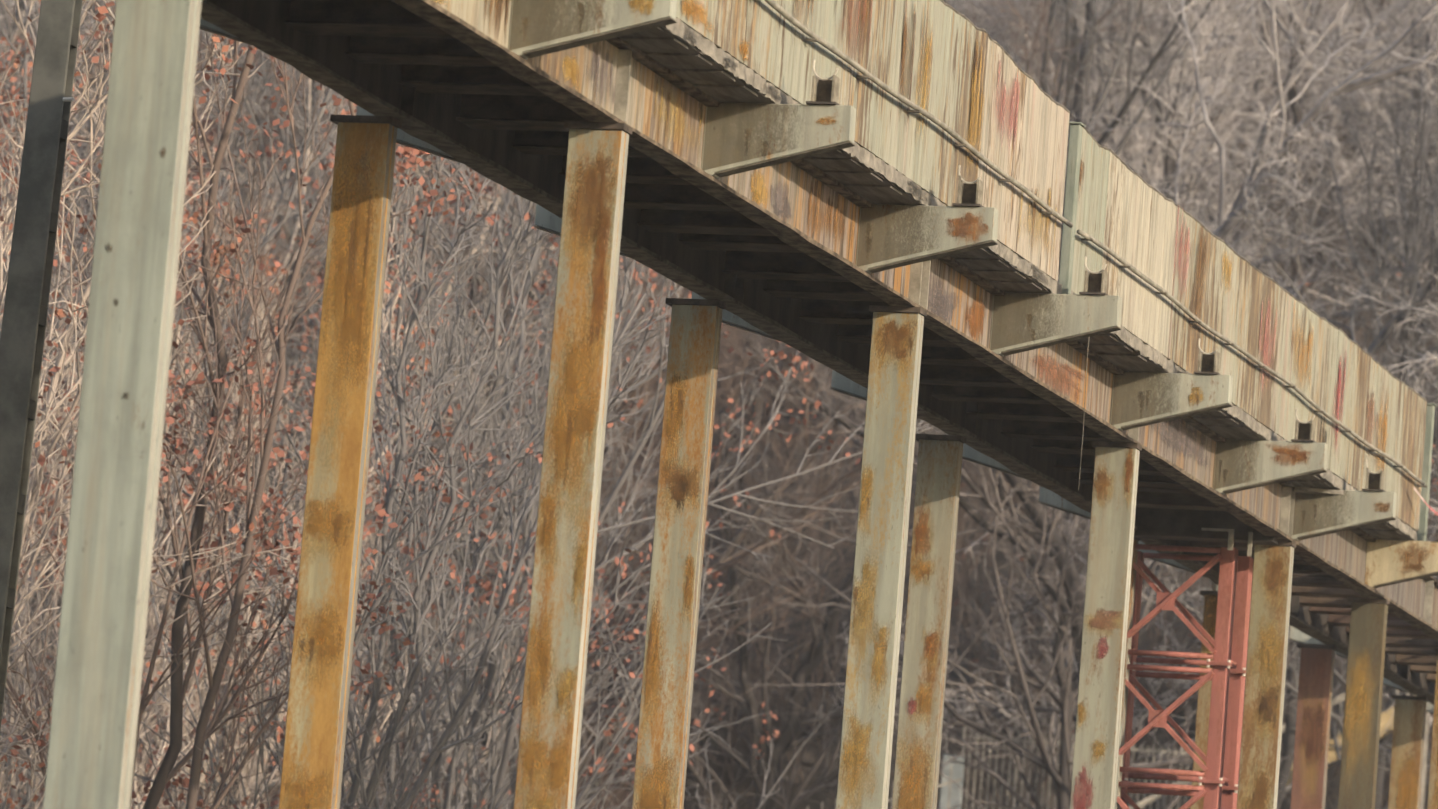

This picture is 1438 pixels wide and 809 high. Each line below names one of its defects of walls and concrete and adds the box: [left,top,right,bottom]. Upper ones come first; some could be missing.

corrosion [485,0,596,50]
corrosion [901,0,932,130]
corrosion [808,183,927,267]
corrosion [947,213,988,241]
corrosion [537,158,614,566]
corrosion [966,292,1081,398]
corrosion [1111,372,1169,425]
corrosion [1094,452,1133,505]
corrosion [1269,445,1307,465]
corrosion [572,545,586,613]
corrosion [682,557,694,616]
corrosion [851,565,887,700]